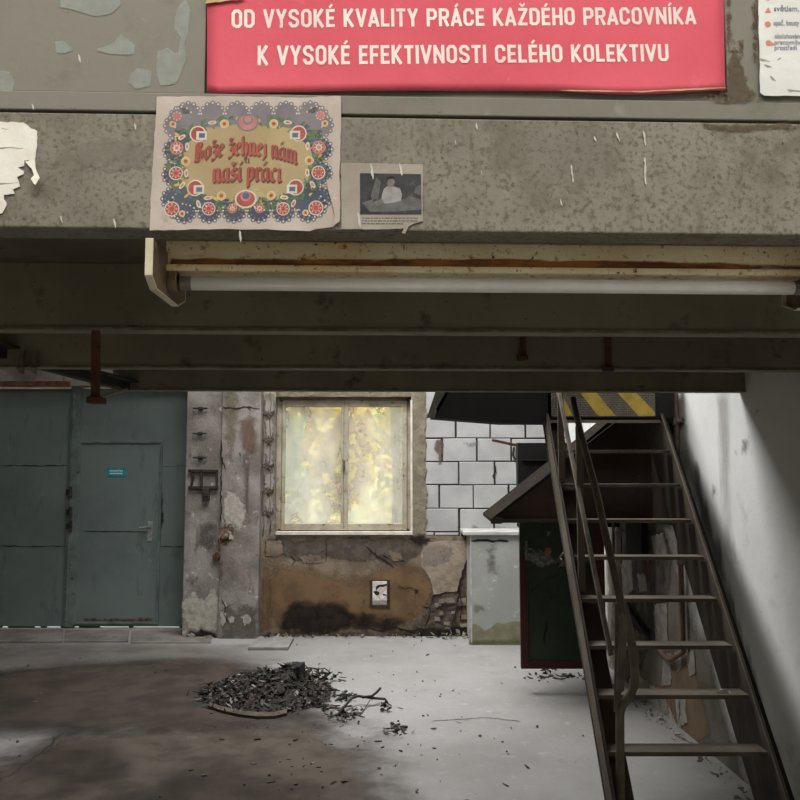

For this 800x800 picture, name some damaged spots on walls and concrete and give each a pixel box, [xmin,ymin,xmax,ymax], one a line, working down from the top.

peeling [60,0,121,16]
peeling [97,35,135,55]
peeling [128,0,190,89]
damp [226,392,255,453]
crack [223,405,259,413]
crack [220,442,241,522]
peeling [223,489,246,532]
flaking render [263,392,468,636]
crack [366,546,394,568]
peeling [181,590,257,639]
damp [261,563,433,636]